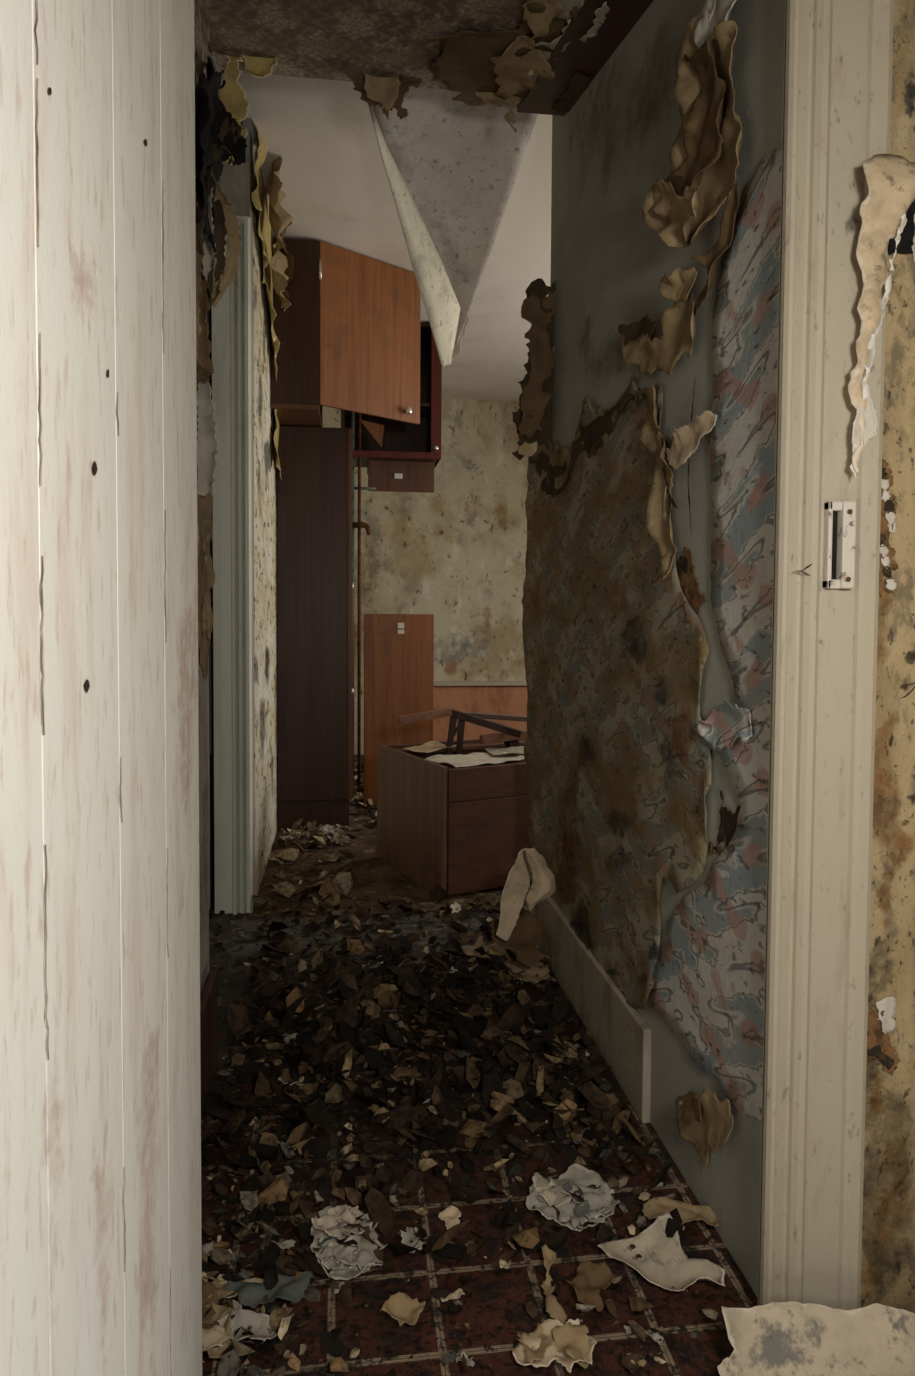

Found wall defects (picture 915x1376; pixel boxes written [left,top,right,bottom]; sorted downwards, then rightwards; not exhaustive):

damp [906,84,915,130]
spalling [888,199,915,262]
flaking render [676,547,705,615]
flaking render [709,788,741,860]